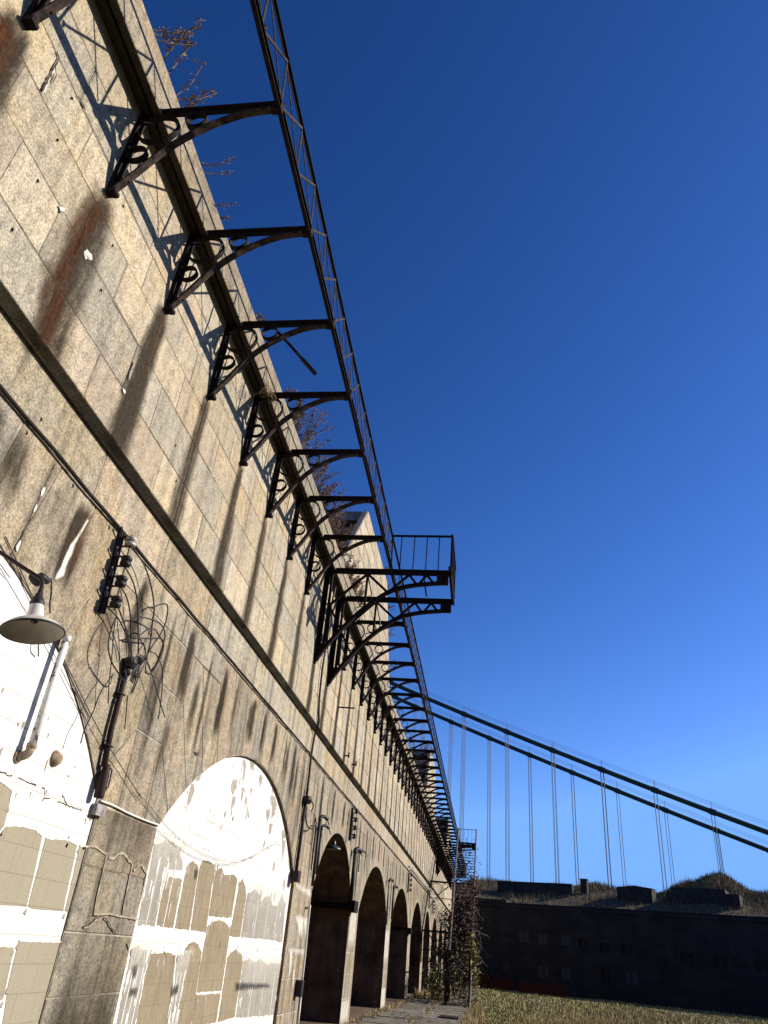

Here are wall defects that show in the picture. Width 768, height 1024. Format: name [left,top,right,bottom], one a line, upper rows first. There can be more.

corrosion [43,203,99,338]
peeling [0,779,86,919]
peeling [116,758,290,1024]
peeling [0,939,61,1024]